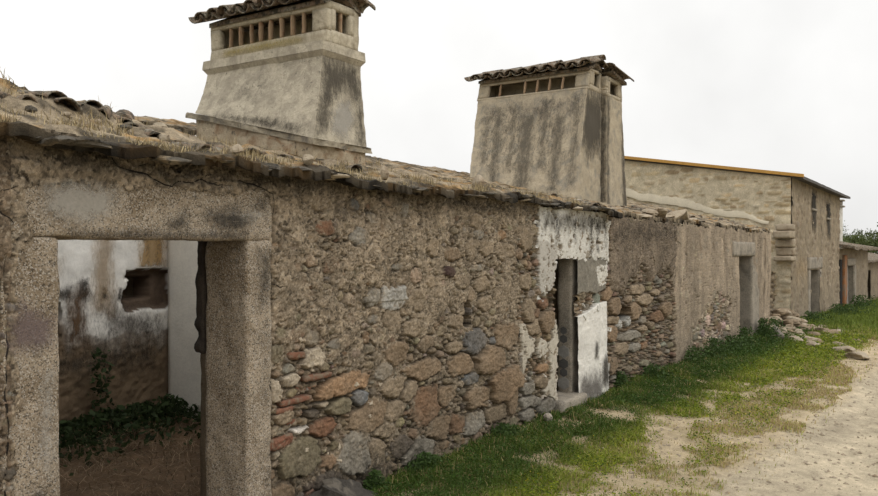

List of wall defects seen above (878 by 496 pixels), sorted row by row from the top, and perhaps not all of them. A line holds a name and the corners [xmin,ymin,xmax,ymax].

crack [105,156,274,211]
water stain [59,279,158,374]
flaking render [517,316,559,401]
spalling [531,205,677,399]